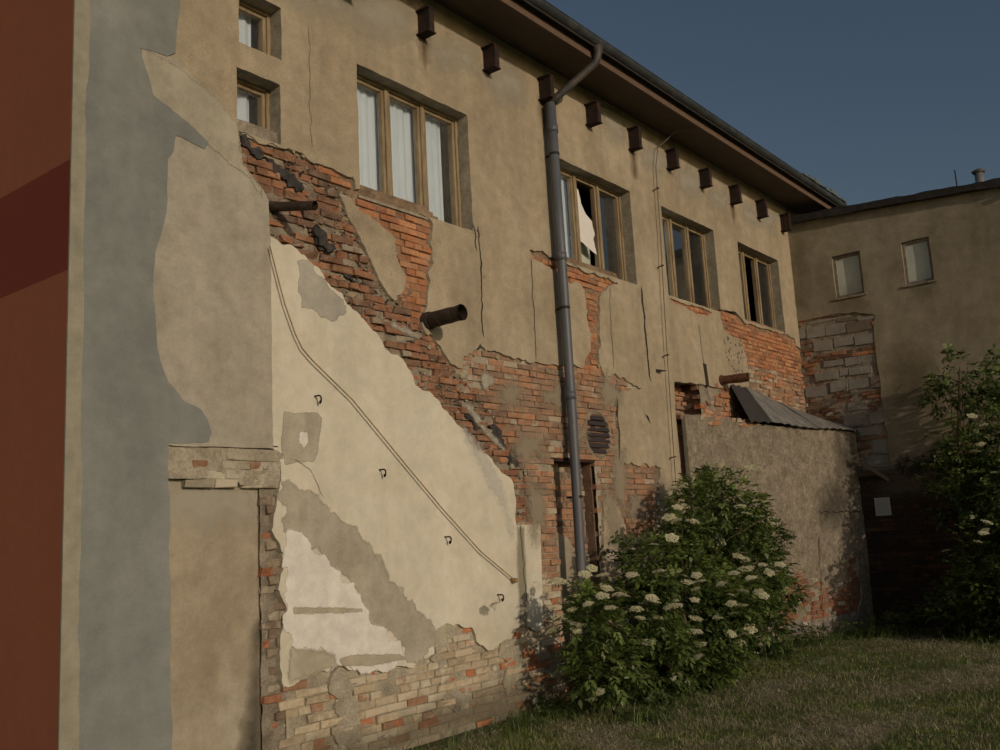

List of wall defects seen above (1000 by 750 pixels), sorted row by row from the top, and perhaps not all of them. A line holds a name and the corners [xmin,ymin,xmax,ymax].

crack [307,28,315,146]
spalling [140,49,659,750]
spalling [672,300,892,469]
spalling [779,557,861,639]